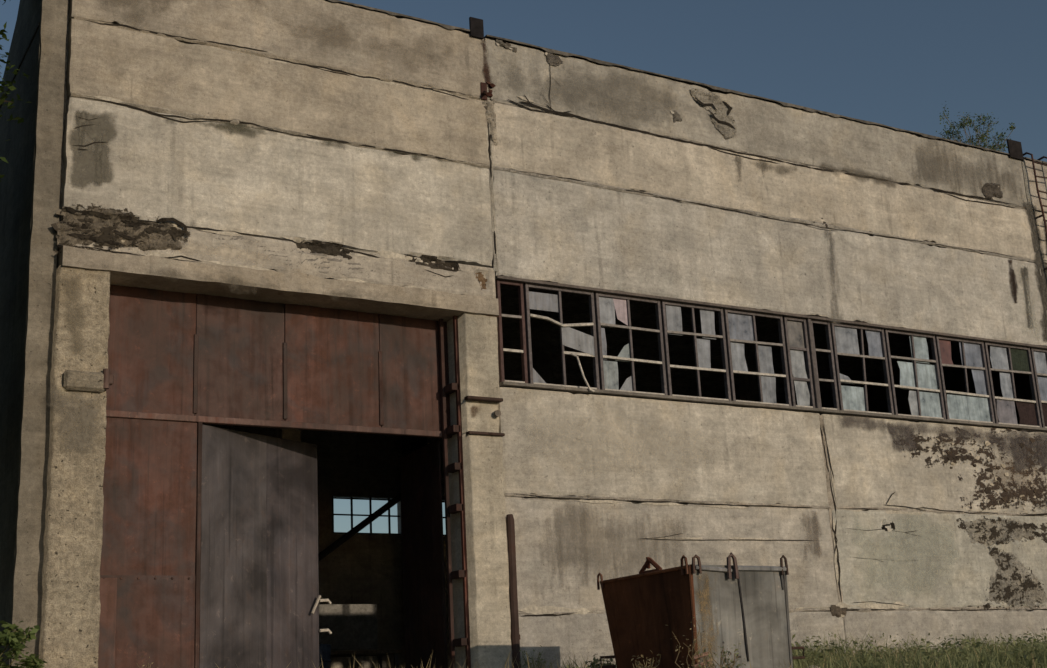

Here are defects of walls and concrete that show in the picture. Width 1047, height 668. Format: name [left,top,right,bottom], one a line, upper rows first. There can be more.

leakage [70,111,116,187]
crack [73,20,1022,256]
spalling [690,88,737,139]
spalling [51,203,190,254]
spalling [215,234,375,275]
spalling [405,254,459,277]
leakage [1021,203,1047,341]
crack [516,423,1047,612]
peeling [893,427,1047,612]